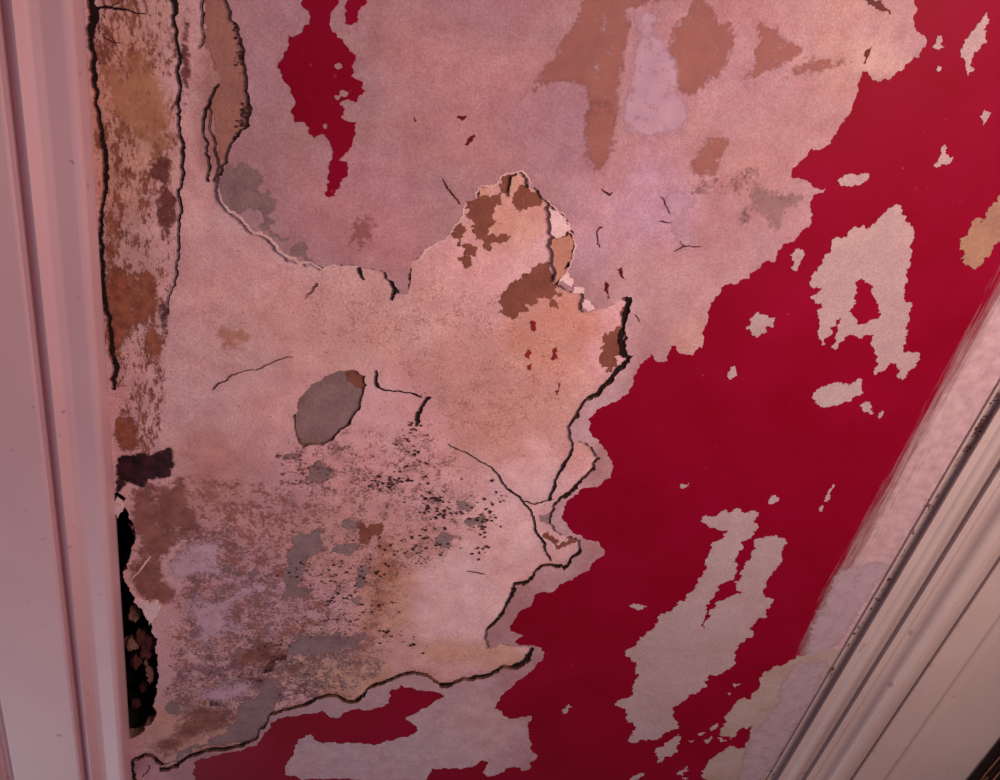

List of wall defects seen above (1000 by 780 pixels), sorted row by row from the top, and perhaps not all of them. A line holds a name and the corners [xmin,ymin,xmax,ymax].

crack [87,0,147,390]
crack [168,0,221,311]
crack [213,356,293,390]
leakage [116,420,508,758]
crack [375,370,431,427]
peeling [131,0,927,780]
crack [449,297,640,637]
crack [659,196,701,252]
peeling [959,195,1000,269]